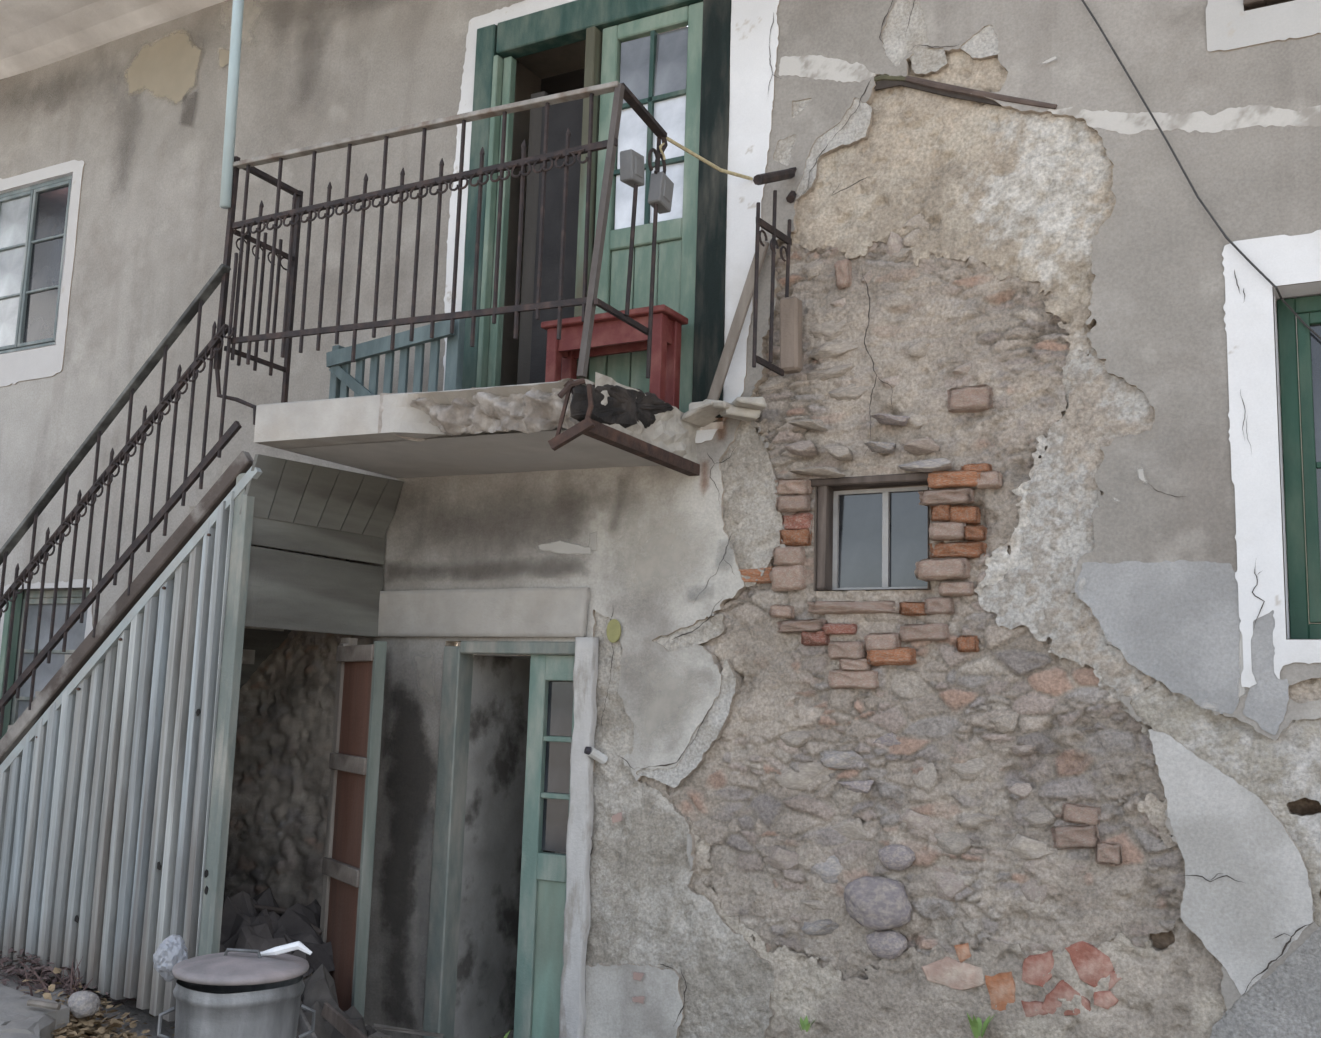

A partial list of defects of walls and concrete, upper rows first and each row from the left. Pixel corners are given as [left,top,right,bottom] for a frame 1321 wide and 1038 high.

flaking render [125,31,201,123]
flaking render [219,49,230,67]
spalling [410,378,579,437]
flaking render [586,0,1227,1038]
peeling [1243,610,1290,735]
damp [381,656,436,1029]